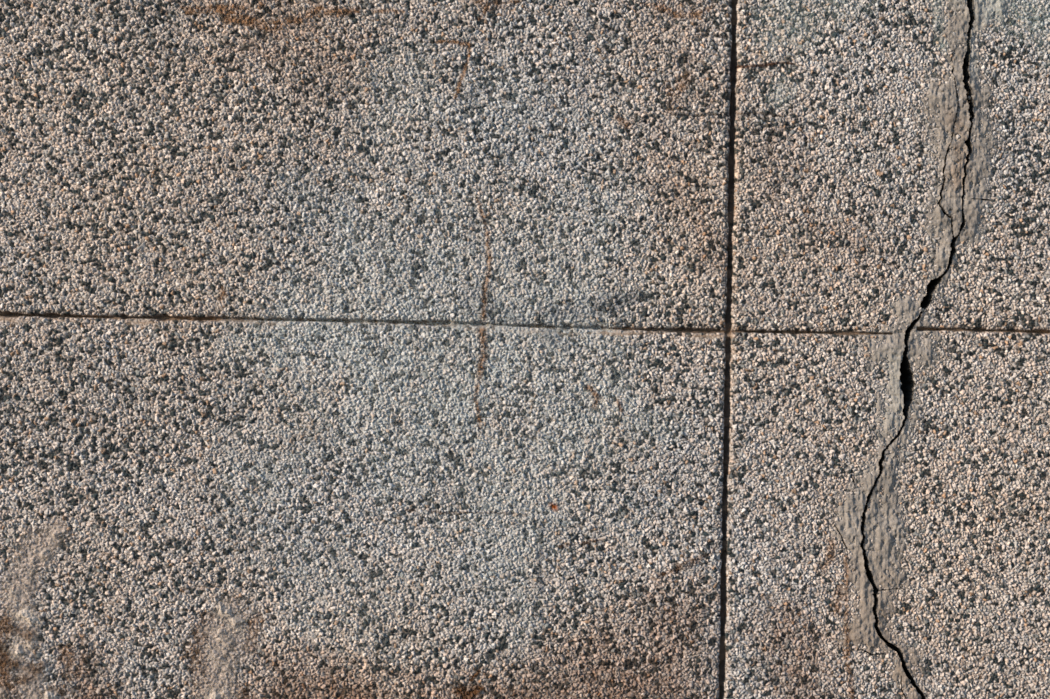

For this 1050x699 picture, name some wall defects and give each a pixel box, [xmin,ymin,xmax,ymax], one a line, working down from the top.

water stain [8,524,64,699]
crack [834,0,992,699]